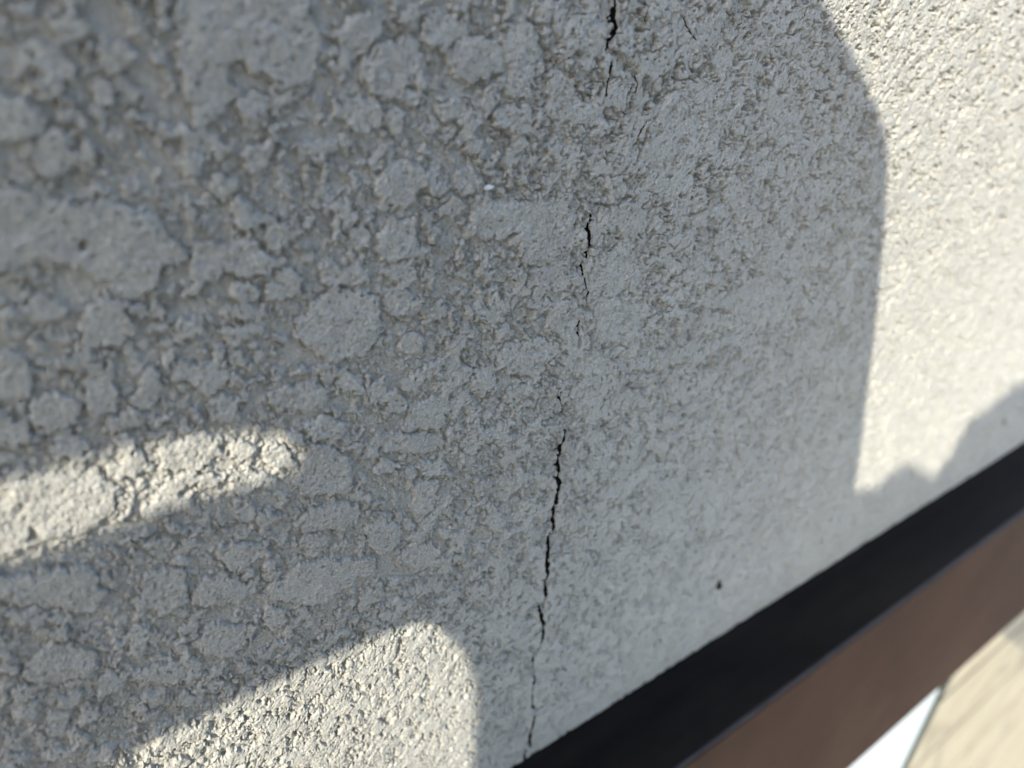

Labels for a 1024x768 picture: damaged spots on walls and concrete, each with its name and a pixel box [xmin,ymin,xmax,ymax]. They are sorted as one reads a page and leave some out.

crack [605,0,648,137]
crack [580,214,592,297]
crack [523,392,567,759]